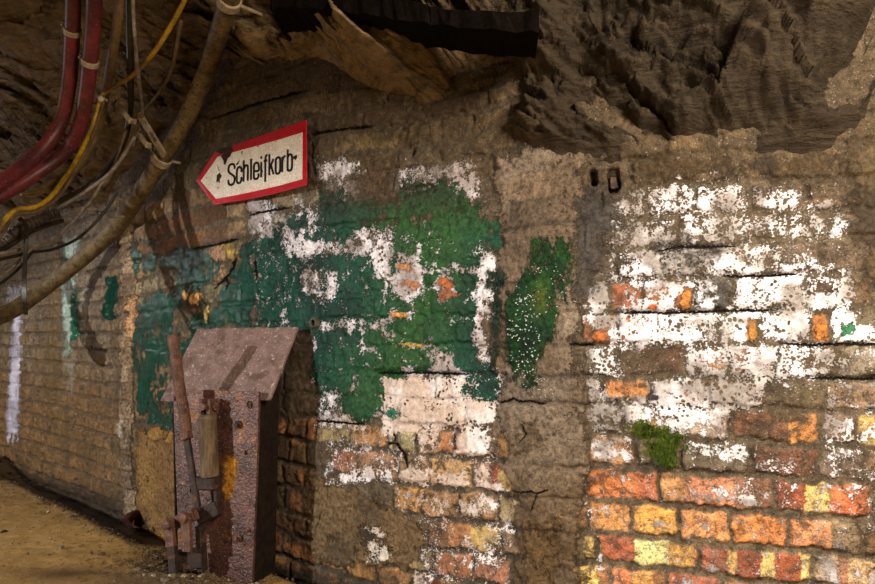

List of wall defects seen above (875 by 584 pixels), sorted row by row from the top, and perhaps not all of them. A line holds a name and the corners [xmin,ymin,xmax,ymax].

peeling [100,276,118,321]
crack [783,340,875,348]
peeling [128,155,516,584]
peeling [574,168,875,584]
crack [499,397,548,405]
crack [386,433,408,468]